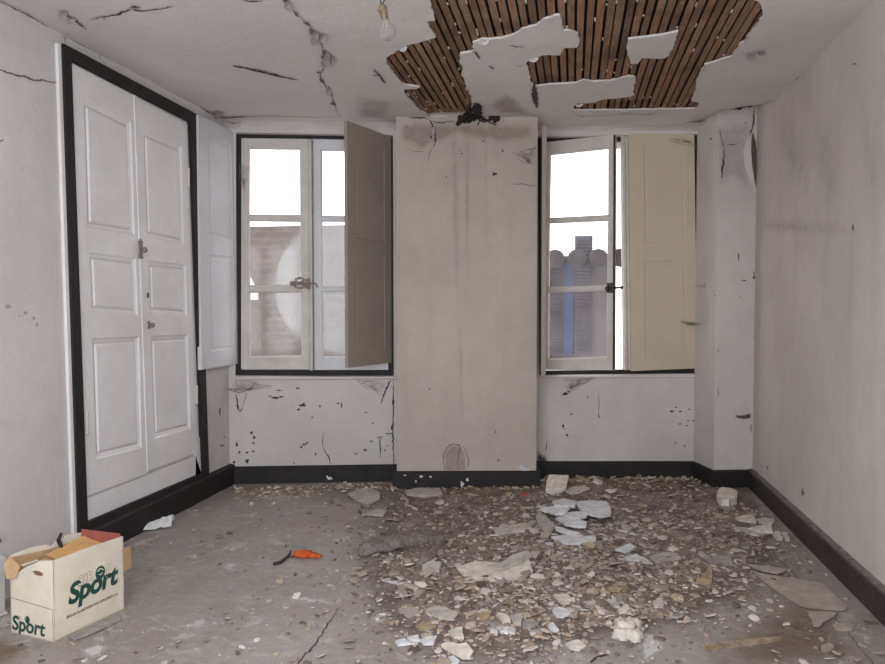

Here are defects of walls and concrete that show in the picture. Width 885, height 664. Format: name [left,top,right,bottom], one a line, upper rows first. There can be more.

crack [233,66,295,80]
crack [283,0,341,117]
crack [201,107,260,119]
crack [409,117,454,155]
crack [720,132,738,178]
crack [297,609,339,664]